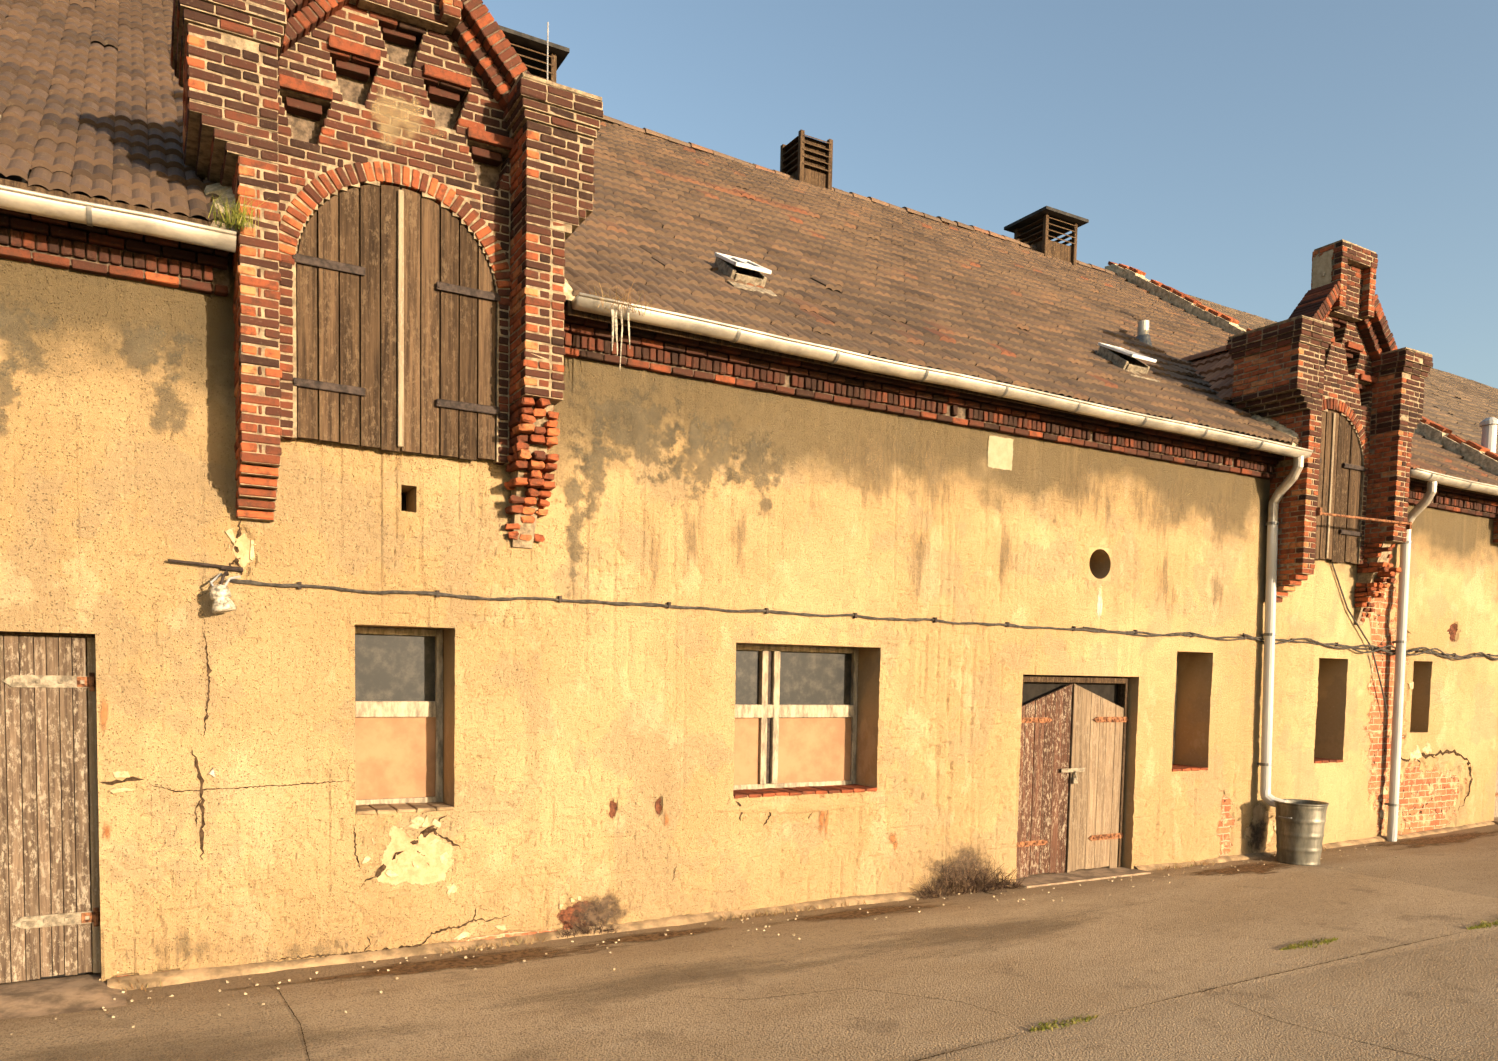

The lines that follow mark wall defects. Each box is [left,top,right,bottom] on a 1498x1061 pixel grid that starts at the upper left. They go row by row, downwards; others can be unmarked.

leakage [120,325,193,431]
crack [101,631,345,860]
spalling [361,815,458,897]
spalling [1365,553,1467,836]